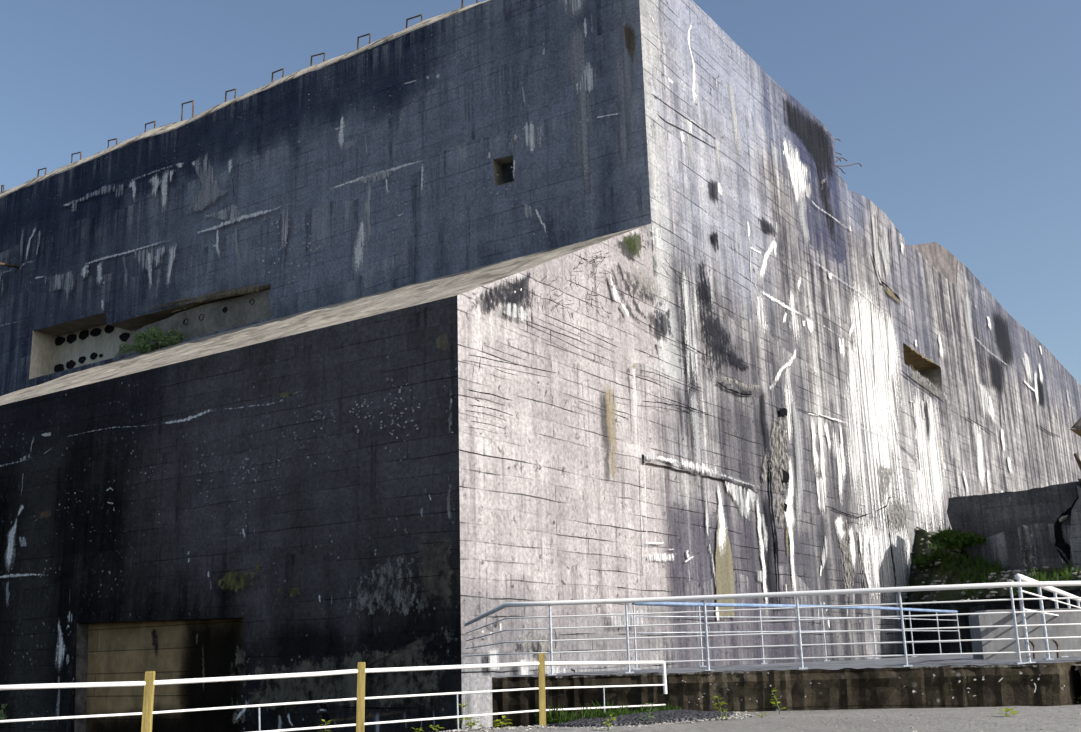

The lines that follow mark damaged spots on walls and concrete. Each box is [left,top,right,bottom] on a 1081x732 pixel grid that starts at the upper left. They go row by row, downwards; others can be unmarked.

leakage [64,163,182,227]
leakage [775,98,835,241]
leakage [36,243,176,300]
leakage [472,272,535,329]
corrosion [605,387,617,476]
leakage [647,254,768,620]
leakage [784,214,968,620]
leakage [972,423,1003,493]
leakage [980,310,1045,471]
peeling [348,536,453,618]
leakage [86,620,242,732]
peeling [231,630,452,730]